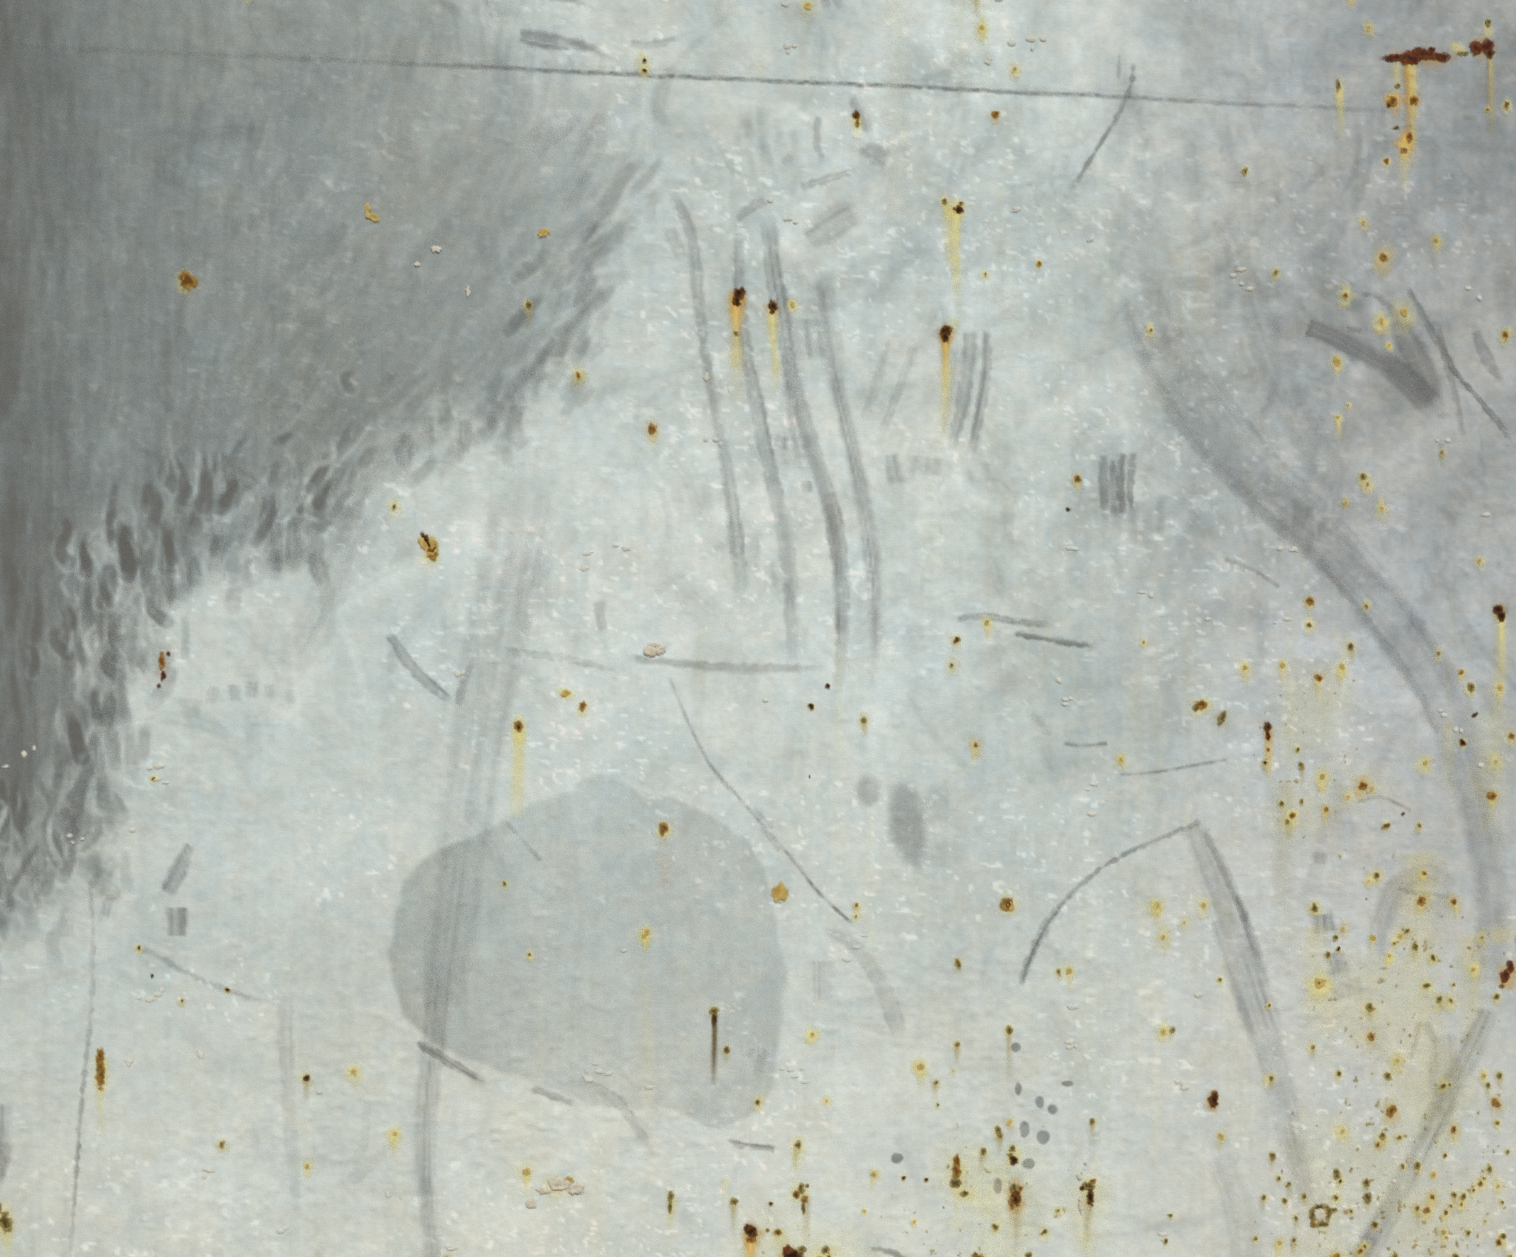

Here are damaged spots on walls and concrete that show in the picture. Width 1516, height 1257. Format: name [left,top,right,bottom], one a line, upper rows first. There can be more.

corrosion [1383,19,1495,107]
corrosion [731,287,745,342]
corrosion [940,325,952,379]
corrosion [1264,722,1272,764]
corrosion [709,1007,730,1066]
corrosion [982,1119,1018,1165]
corrosion [793,1183,809,1214]
corrosion [950,1154,969,1197]
corrosion [1008,1183,1023,1210]
corrosion [1080,1178,1096,1206]
corrosion [1262,1153,1372,1245]
corrosion [1400,1152,1504,1236]